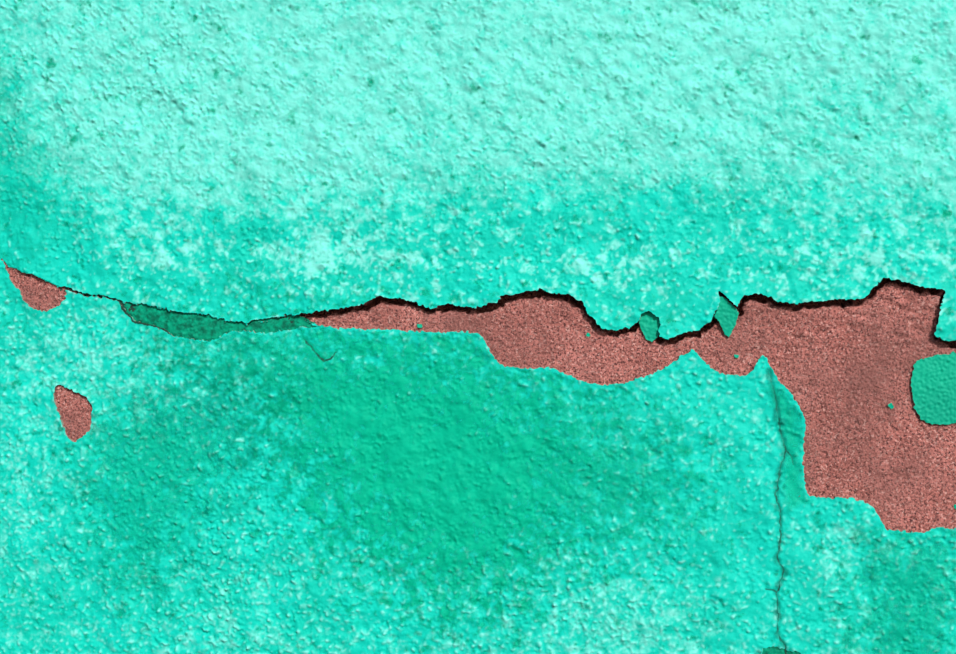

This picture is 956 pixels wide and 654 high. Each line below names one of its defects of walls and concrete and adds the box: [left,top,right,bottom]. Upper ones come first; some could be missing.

peeling [1,259,76,312]
crack [60,286,174,336]
peeling [55,385,93,442]
peeling [122,278,956,533]
crack [766,373,793,654]